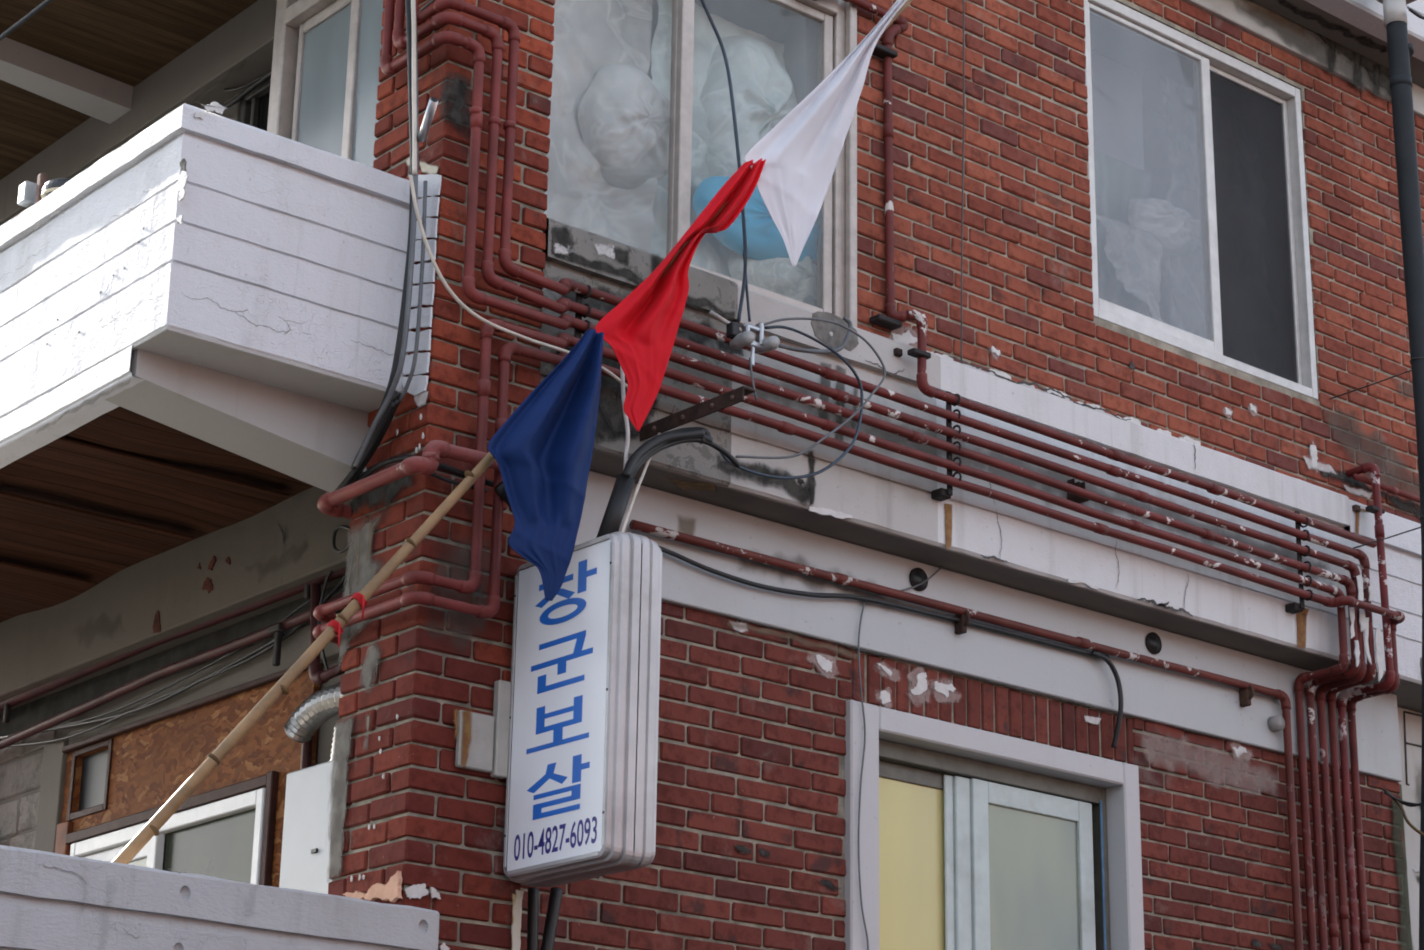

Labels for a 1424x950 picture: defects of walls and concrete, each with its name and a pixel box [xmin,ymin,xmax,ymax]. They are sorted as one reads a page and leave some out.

crack [86,291,307,334]
flaking render [343,871,403,902]